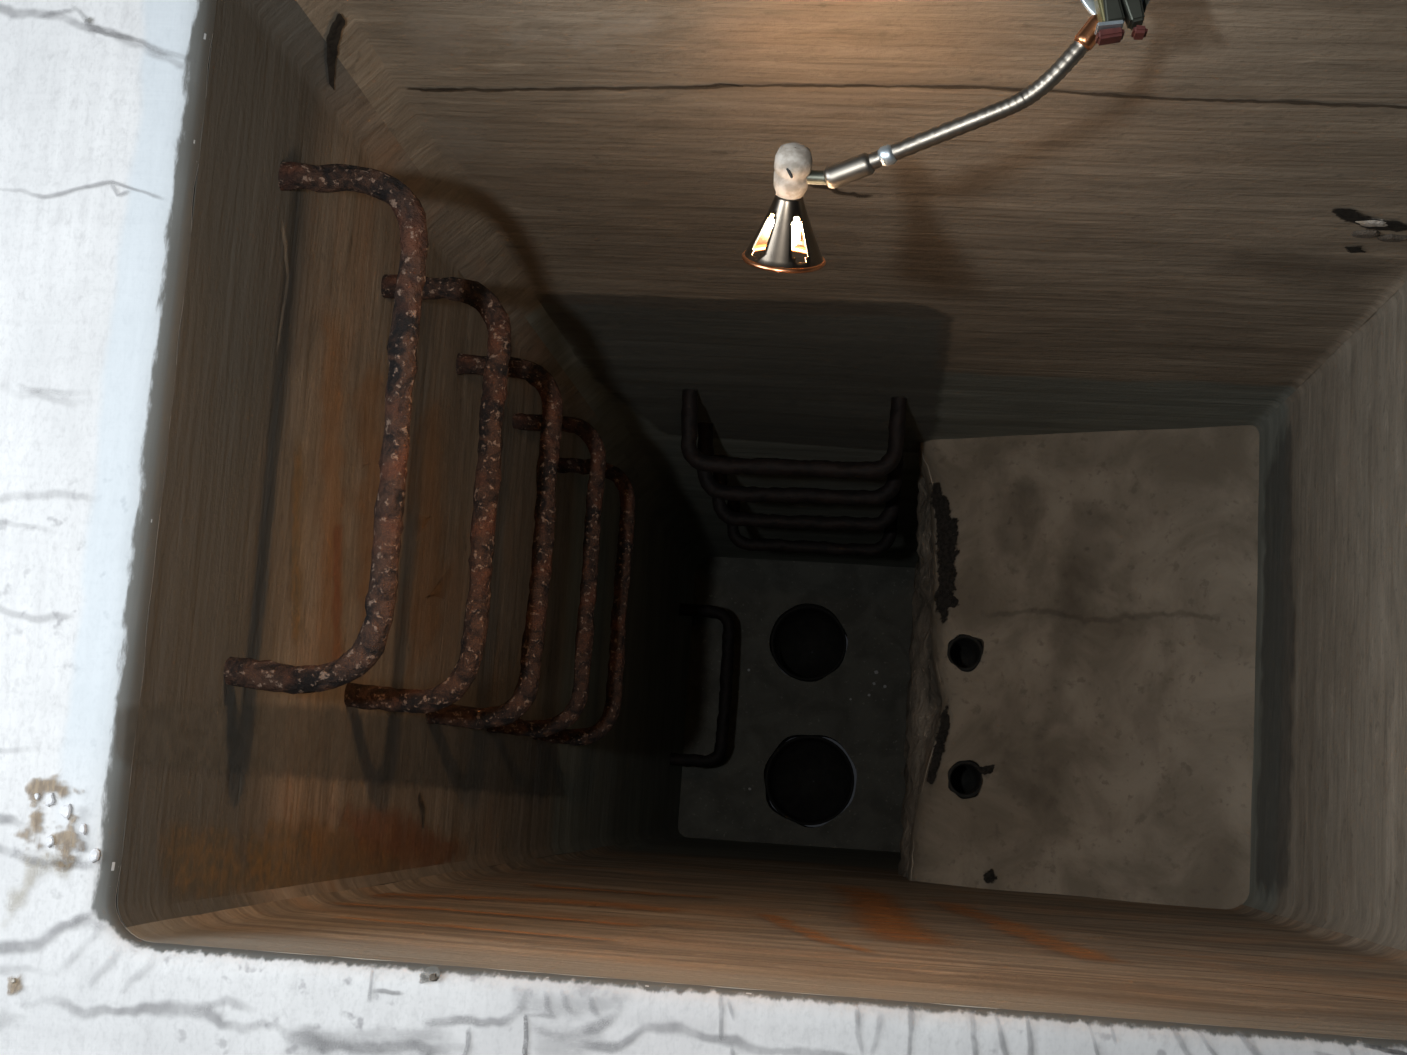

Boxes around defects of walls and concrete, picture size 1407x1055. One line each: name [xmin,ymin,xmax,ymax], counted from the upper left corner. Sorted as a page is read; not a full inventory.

crack [407,83,1407,109]
crack [521,1016,529,1055]
crack [1366,1044,1407,1055]